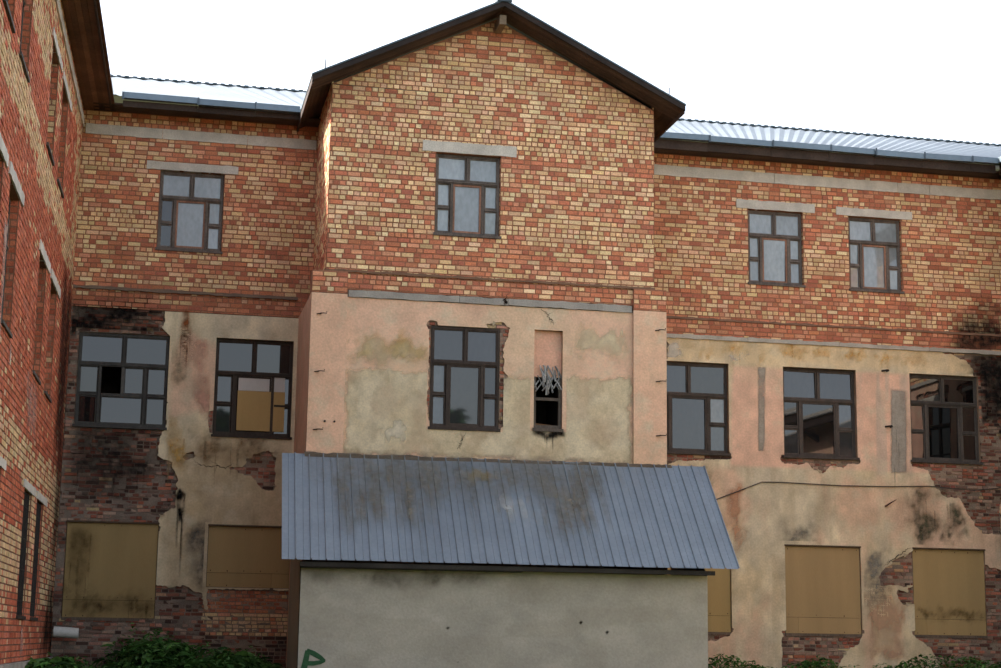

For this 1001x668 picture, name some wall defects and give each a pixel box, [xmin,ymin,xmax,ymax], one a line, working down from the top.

flaking render [50,306,289,668]
peeling [344,320,632,463]
leakage [912,490,964,543]
flaking render [911,353,1001,535]
flaking render [781,630,864,668]
flaking render [912,565,1001,668]